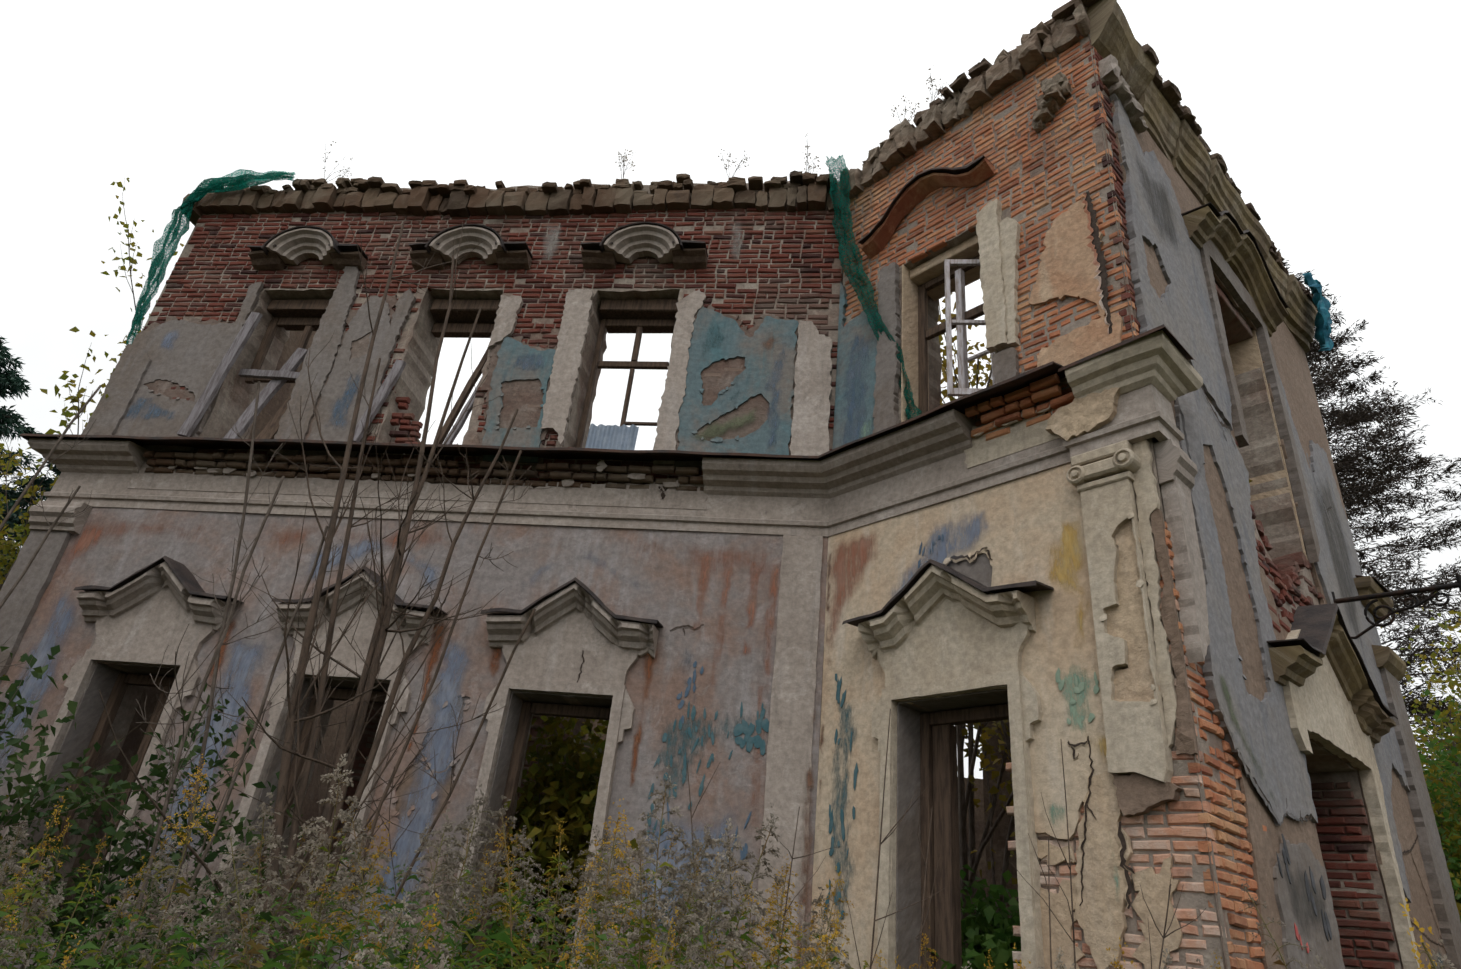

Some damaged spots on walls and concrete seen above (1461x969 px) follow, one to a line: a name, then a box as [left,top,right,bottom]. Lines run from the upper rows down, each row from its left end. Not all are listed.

peeling [897,515,993,593]
flaking render [1051,509,1198,755]
peeling [636,661,769,943]
peeling [824,674,859,919]
crack [1067,736,1135,909]
spalling [1112,773,1183,817]